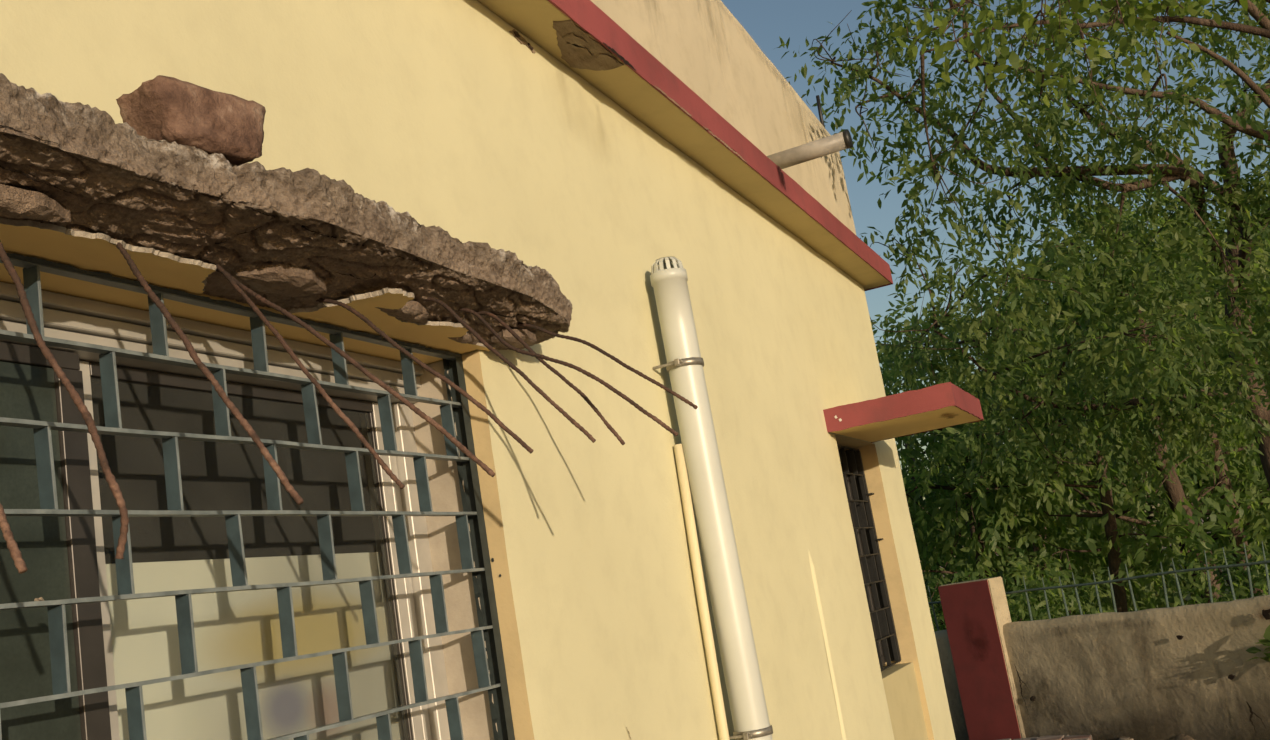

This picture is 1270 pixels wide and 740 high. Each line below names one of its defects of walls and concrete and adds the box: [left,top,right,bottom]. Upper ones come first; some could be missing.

peeling [509,29,536,53]
peeling [553,20,636,71]
crack [0,125,60,145]
crack [137,176,418,279]
spalling [0,133,698,505]
spalling [0,241,129,559]
spalling [0,503,28,574]